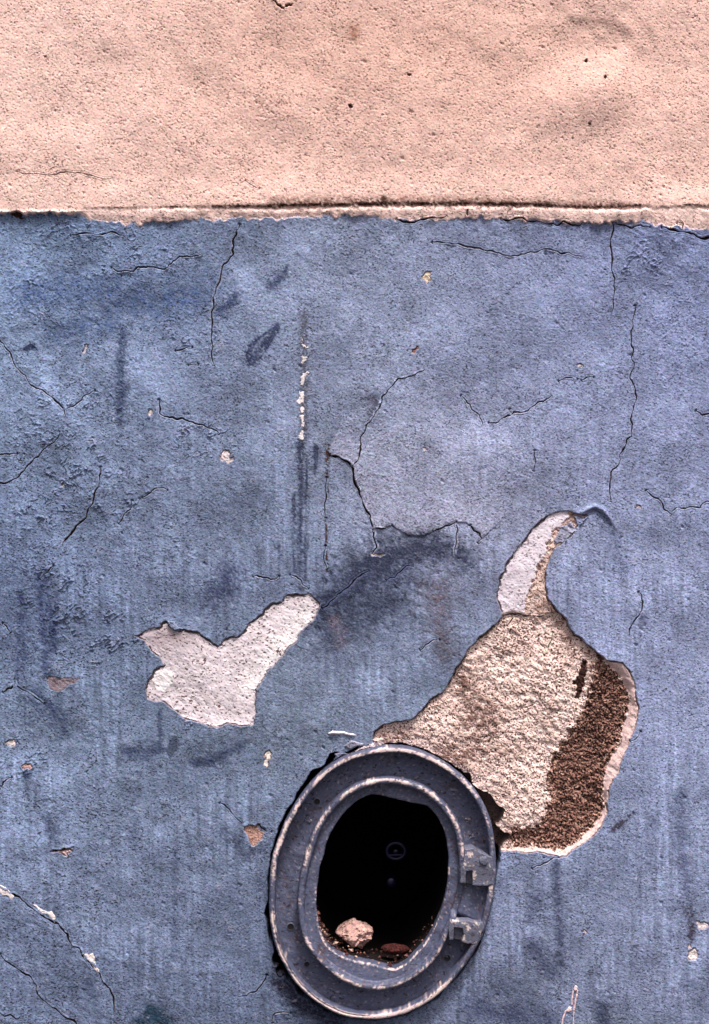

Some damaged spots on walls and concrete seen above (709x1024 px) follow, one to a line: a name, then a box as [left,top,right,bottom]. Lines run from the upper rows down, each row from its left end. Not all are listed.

crack [111,224,242,367]
leakage [246,324,280,366]
crack [396,215,584,259]
crack [607,221,709,502]
leakage [292,442,318,589]
crack [253,369,425,610]
leakage [316,531,471,650]
peeling [47,676,80,691]
peeling [138,594,320,730]
spalling [328,511,639,857]
peeling [244,824,264,846]
crack [0,886,117,1024]